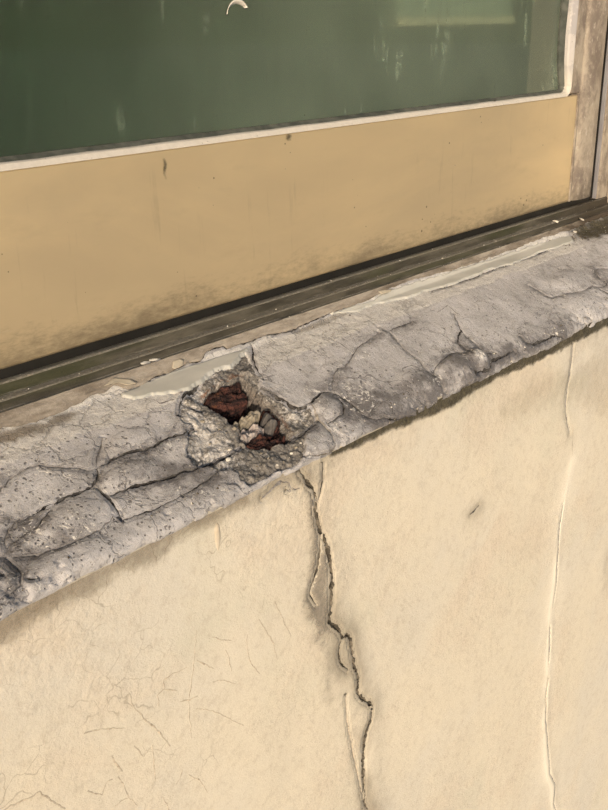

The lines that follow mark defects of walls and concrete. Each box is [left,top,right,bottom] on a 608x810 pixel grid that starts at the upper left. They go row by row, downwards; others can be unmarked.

crack [529,268,608,299]
spalling [105,348,314,486]
crack [0,251,574,810]